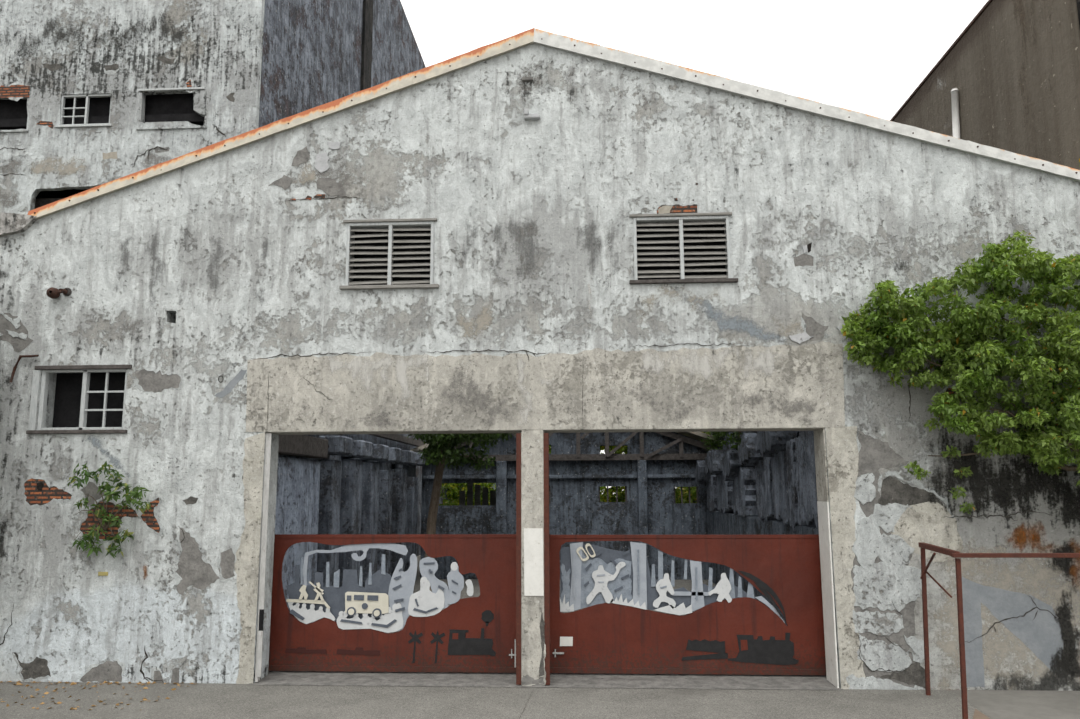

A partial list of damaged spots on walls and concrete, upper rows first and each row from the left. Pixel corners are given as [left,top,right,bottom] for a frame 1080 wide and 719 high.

damp [14,16,194,59]
peeling [269,142,348,198]
crack [421,349,551,360]
crack [633,341,754,349]
damp [926,427,1080,528]
damp [0,519,8,557]
flaking render [21,476,164,544]
flaking render [173,527,237,595]
flaking render [846,431,955,690]
damp [934,542,1080,691]
crack [965,596,1059,642]
flaking render [12,652,51,682]